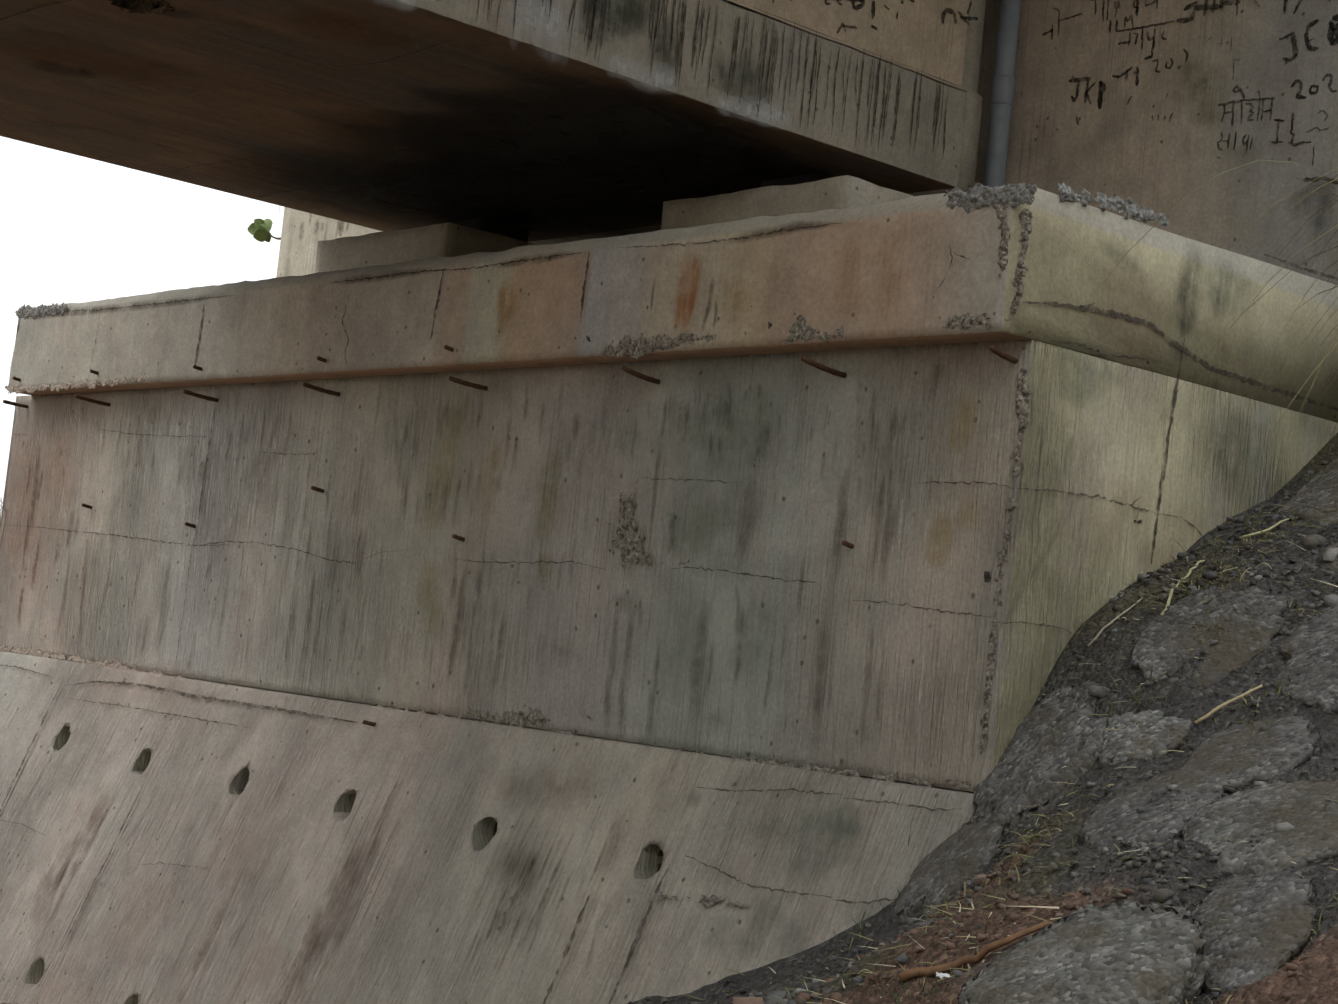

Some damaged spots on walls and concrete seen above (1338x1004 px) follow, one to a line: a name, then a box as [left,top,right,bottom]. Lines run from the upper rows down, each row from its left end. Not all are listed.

spalling [110,0,175,14]
damp [469,0,948,159]
spalling [1057,182,1170,227]
crack [1264,254,1335,279]
spalling [601,332,716,384]
spalling [784,315,847,378]
crack [924,301,1338,564]
spalling [943,182,1037,755]
crack [609,854,896,1004]